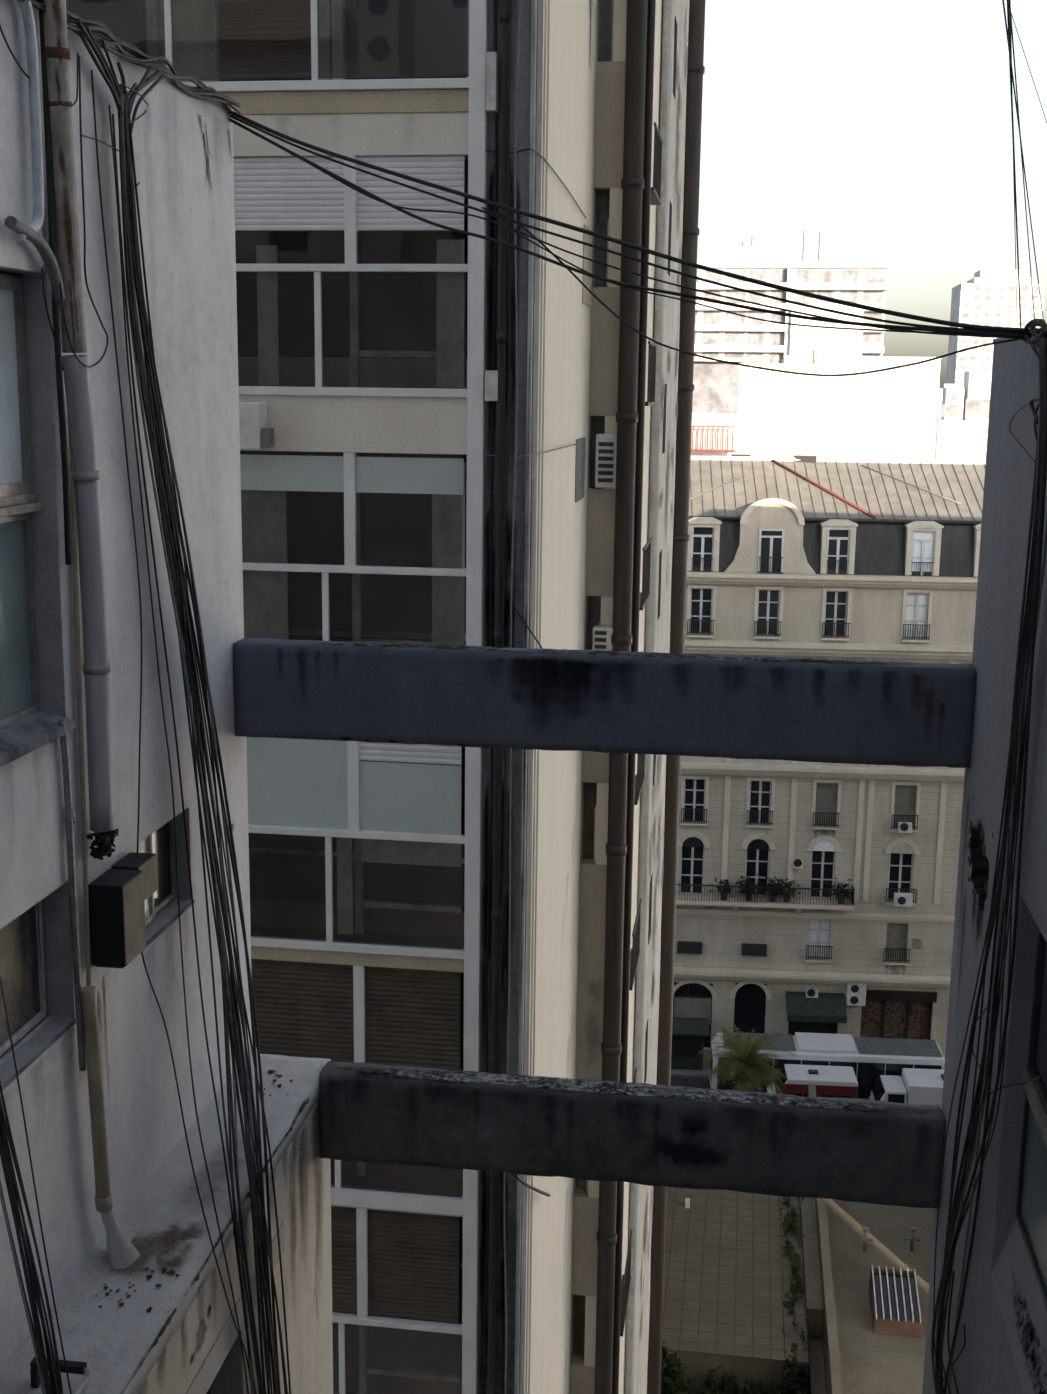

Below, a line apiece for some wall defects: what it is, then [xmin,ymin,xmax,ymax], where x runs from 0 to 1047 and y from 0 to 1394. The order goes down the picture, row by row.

rust [52,0,62,105]
rust [63,191,78,357]